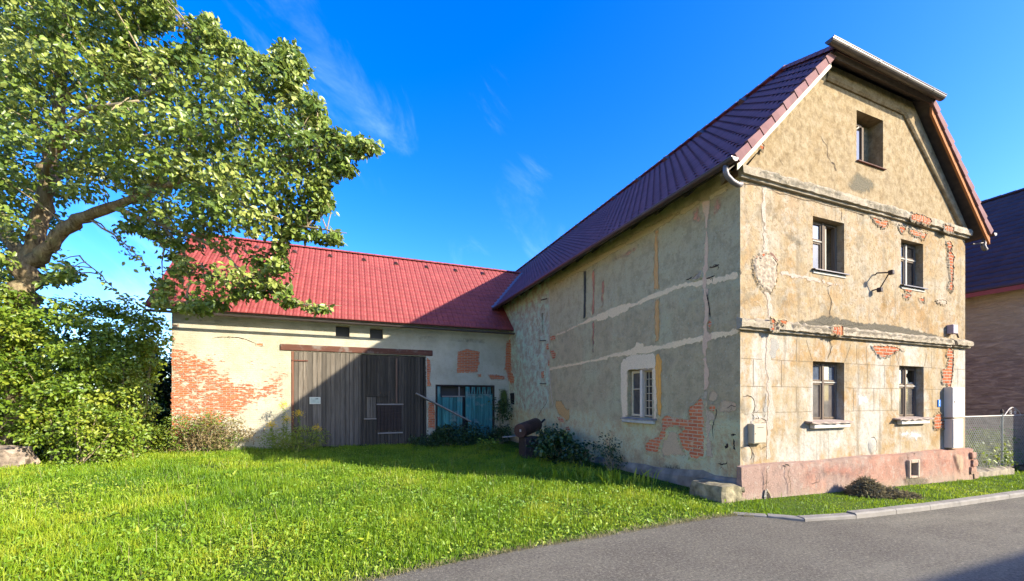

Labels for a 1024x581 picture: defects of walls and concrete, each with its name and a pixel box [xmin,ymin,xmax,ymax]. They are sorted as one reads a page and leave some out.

spalling [867,211,955,307]
spalling [170,317,288,447]
spalling [456,338,515,385]
spalling [870,344,906,360]
spalling [941,347,954,387]
spalling [427,401,436,430]
spalling [620,352,736,463]
spalling [932,411,945,431]